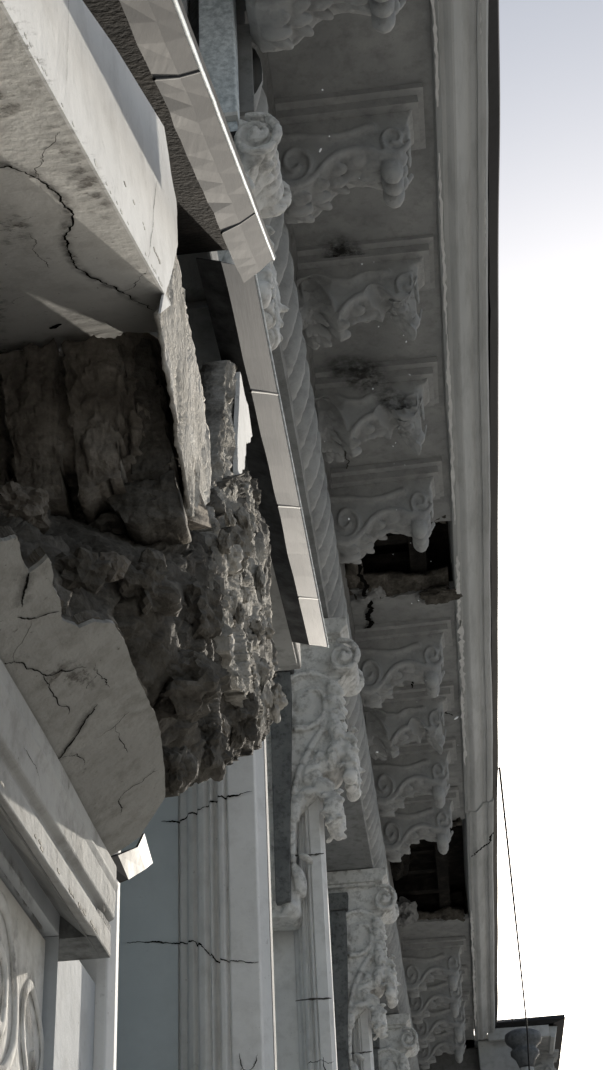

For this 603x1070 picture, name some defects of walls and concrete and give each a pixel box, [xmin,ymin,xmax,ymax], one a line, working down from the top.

spalling [0,247,288,798]